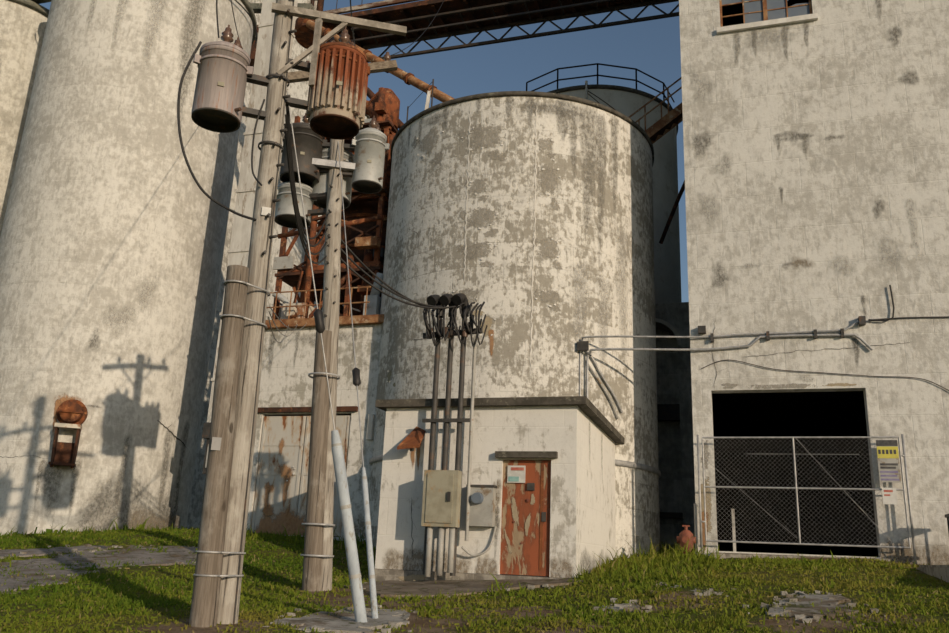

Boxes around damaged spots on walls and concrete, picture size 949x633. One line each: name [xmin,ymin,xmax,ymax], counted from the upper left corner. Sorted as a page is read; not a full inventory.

corrosion [256,438,306,536]
peeling [504,494,535,554]